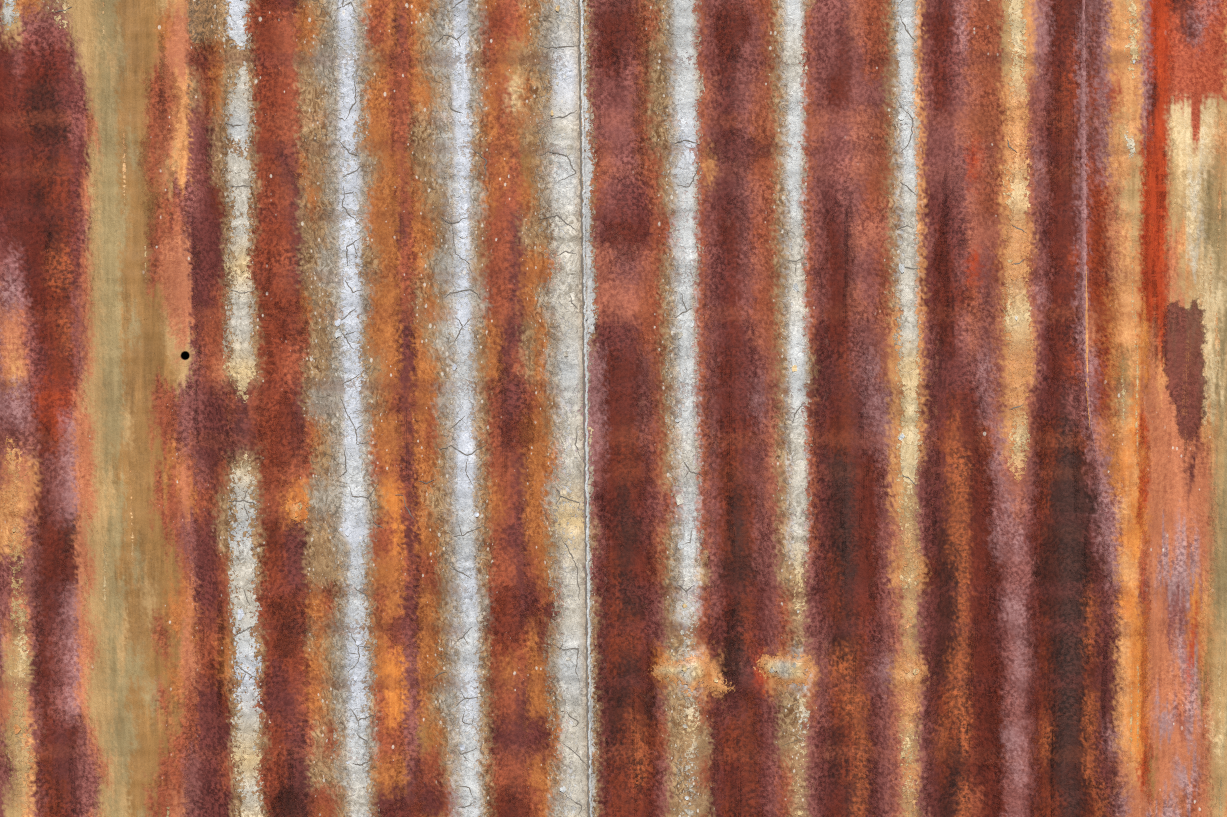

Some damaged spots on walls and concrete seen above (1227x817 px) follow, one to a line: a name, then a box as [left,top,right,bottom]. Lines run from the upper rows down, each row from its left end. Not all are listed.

rust [0,25,91,442]
rust [138,35,241,817]
rust [248,0,314,492]
rust [257,523,322,817]
crack [348,706,372,766]
crack [338,79,433,528]
crack [433,672,482,808]
crack [441,217,480,344]
crack [441,416,484,487]
crack [556,489,580,600]
rust [1025,0,1126,817]
rust [1143,0,1207,463]